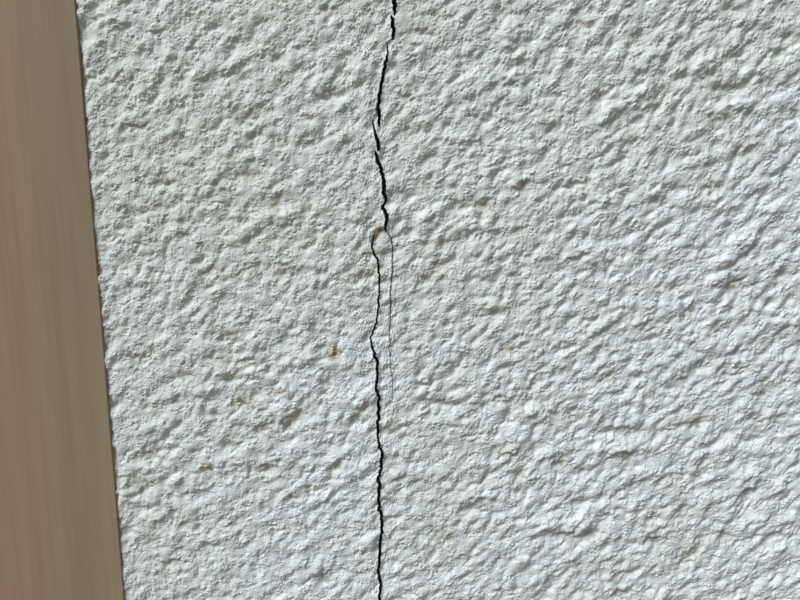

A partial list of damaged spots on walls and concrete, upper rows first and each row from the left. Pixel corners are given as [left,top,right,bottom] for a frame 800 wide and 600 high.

crack [370,0,397,600]